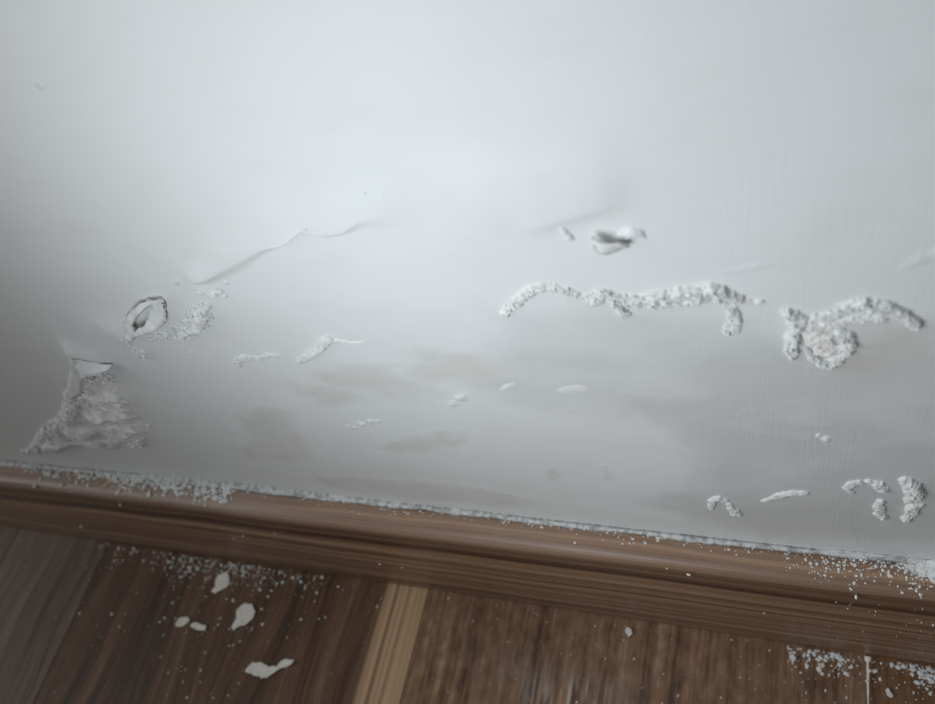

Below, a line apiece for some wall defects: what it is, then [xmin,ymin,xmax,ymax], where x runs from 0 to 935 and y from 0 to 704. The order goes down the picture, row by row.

flaking render [20,281,229,455]
leakage [230,403,316,465]
leakage [274,277,935,548]